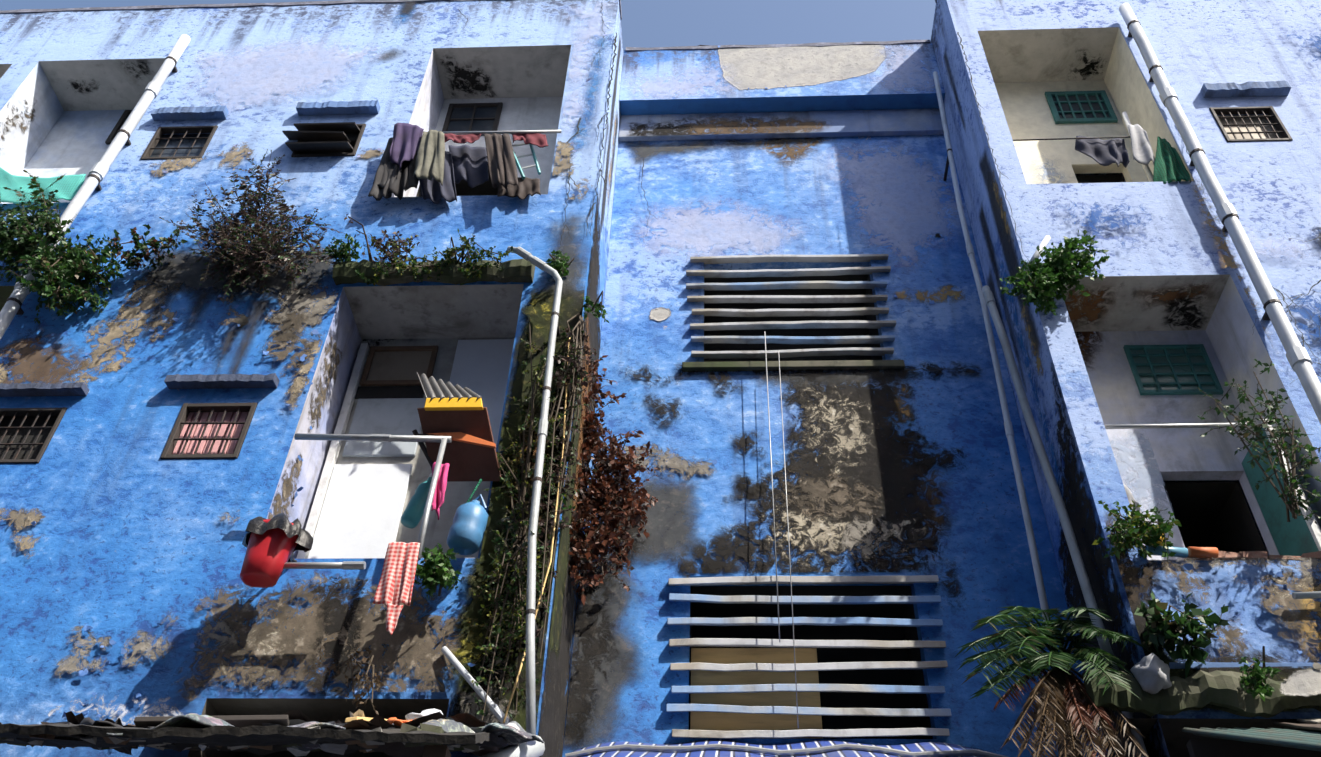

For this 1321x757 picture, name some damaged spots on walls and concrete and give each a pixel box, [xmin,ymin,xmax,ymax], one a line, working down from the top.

damp [396,1,417,25]
damp [123,60,149,78]
flaking render [151,143,253,177]
flaking render [65,277,182,387]
flaking render [216,292,248,358]
damp [143,248,333,374]
flaking render [257,282,342,430]
flaking render [0,508,46,557]
peeling [267,454,303,519]
damp [448,215,980,746]
spalling [48,572,515,726]
flaking render [1160,558,1321,697]